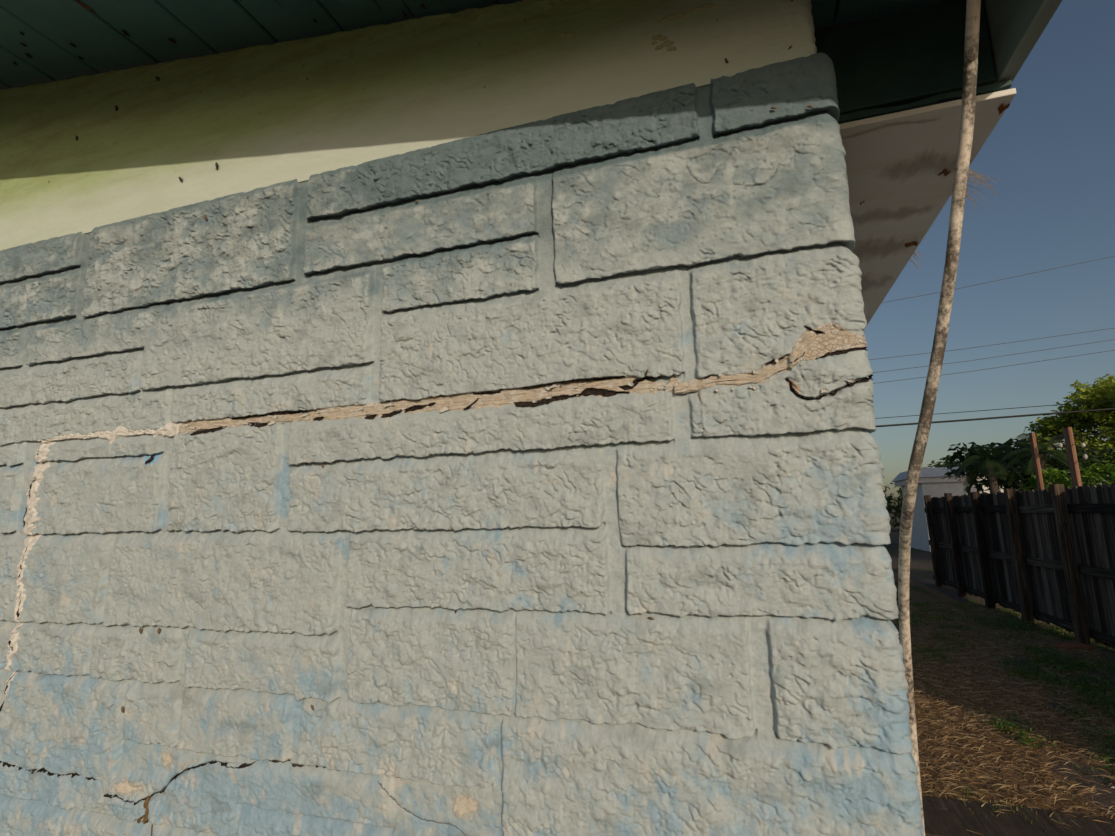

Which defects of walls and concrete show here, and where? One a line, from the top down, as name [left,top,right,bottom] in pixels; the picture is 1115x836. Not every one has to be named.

crack [0,360,873,711]
crack [0,759,326,805]
crack [377,781,466,836]